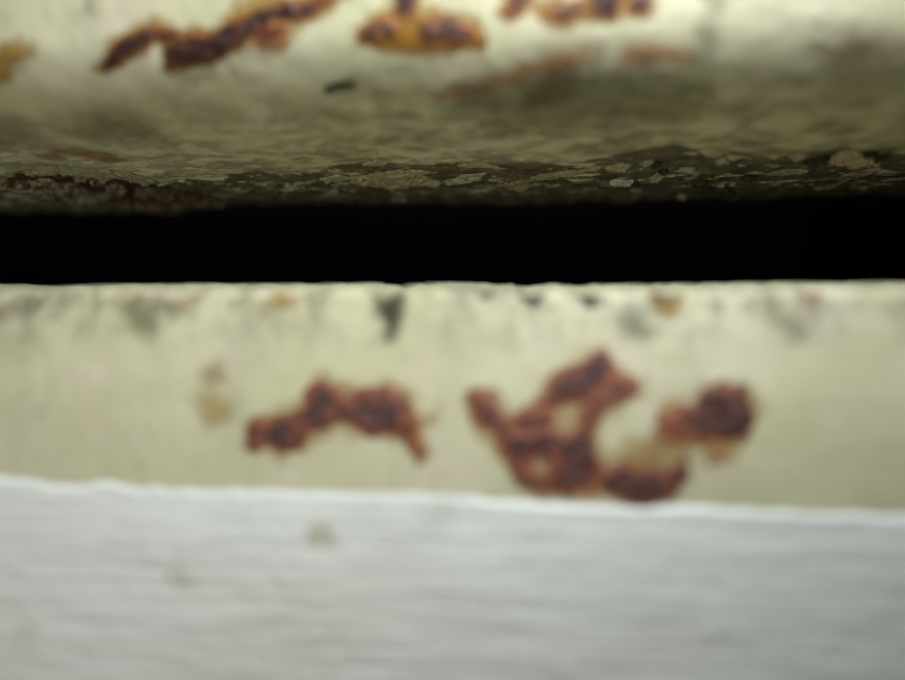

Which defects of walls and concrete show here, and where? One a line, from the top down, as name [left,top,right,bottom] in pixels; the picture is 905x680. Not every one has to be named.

corrosion [94,0,338,72]
corrosion [357,0,487,53]
corrosion [498,0,653,28]
peeling [0,165,282,209]
peeling [319,159,668,202]
peeling [676,150,891,201]
corrosion [246,381,429,462]
corrosion [466,347,755,508]